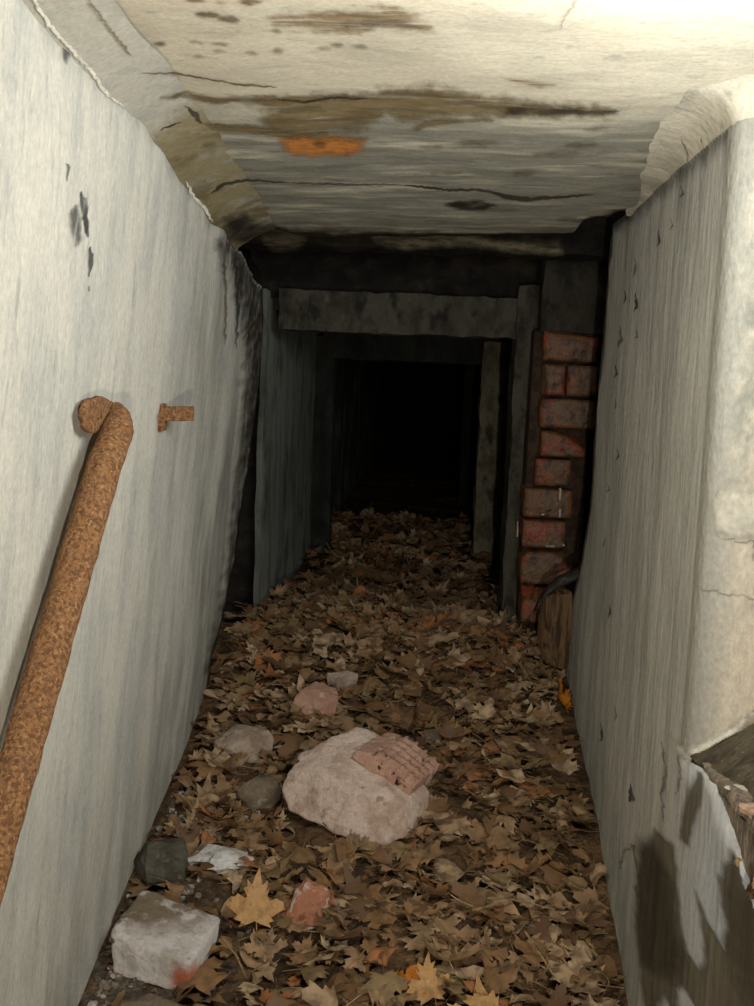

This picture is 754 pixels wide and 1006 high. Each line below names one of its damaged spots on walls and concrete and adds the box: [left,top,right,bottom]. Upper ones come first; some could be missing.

water stain [189,0,239,23]
water stain [272,7,431,33]
water stain [169,91,364,104]
water stain [415,119,494,130]
corrosion [282,137,362,156]
crack [211,179,591,202]
spalling [676,711,754,900]
water stain [637,772,754,1006]